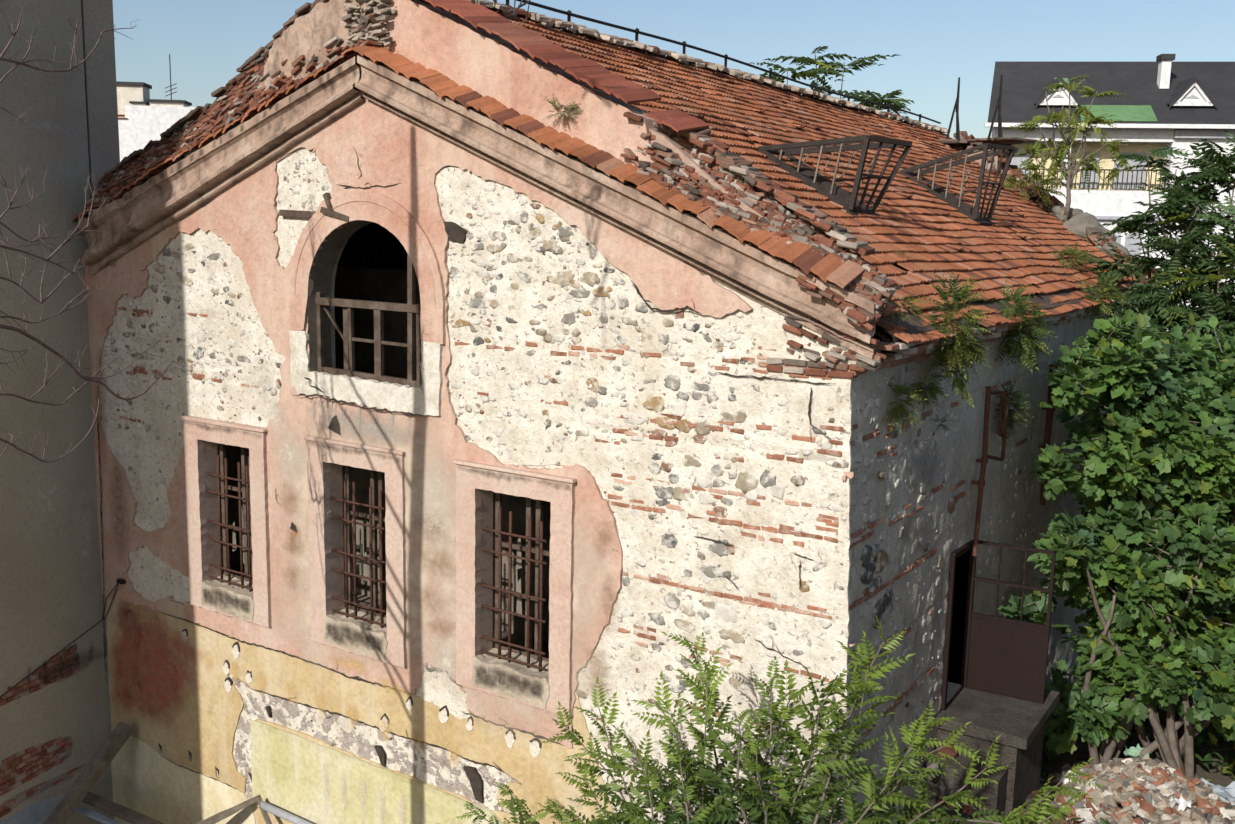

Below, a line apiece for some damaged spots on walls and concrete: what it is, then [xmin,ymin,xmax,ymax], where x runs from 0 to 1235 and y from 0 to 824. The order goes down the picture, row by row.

flaking render [271,148,332,268]
flaking render [99,229,286,604]
flaking render [435,166,966,824]
flaking render [0,643,81,706]
flaking render [0,737,82,824]
flaking render [222,642,517,812]